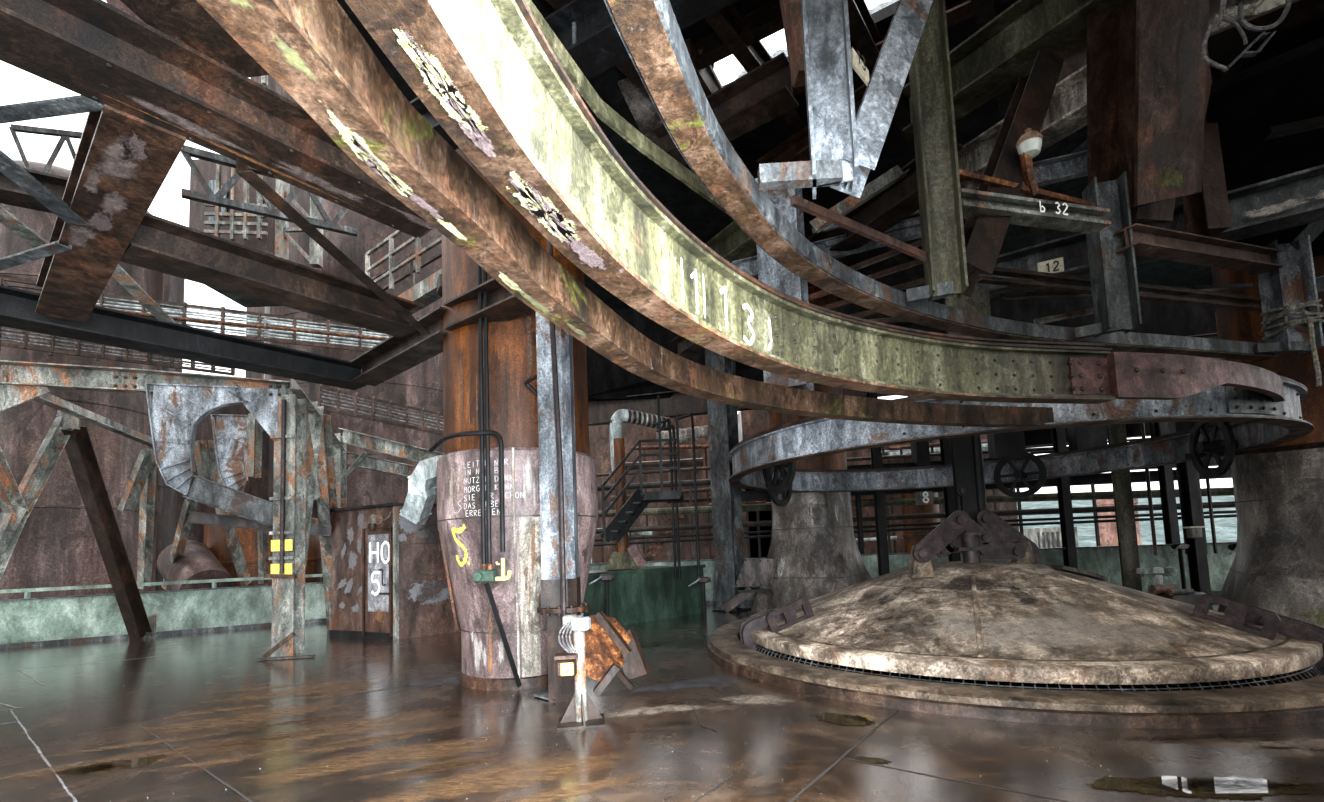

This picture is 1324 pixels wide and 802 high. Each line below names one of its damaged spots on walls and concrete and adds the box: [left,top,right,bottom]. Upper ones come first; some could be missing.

rust [524,519,541,630]
rust [552,524,573,577]